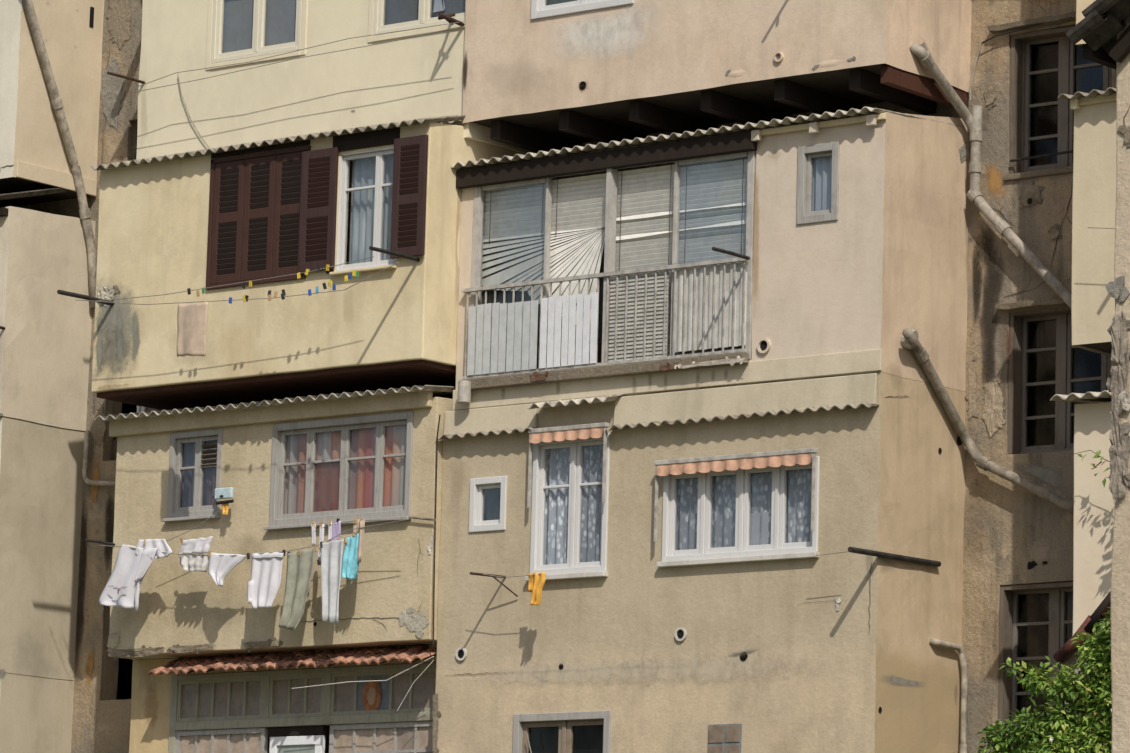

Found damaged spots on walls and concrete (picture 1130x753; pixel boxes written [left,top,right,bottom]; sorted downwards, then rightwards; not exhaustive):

damp [97,293,139,371]
damp [973,233,1002,384]